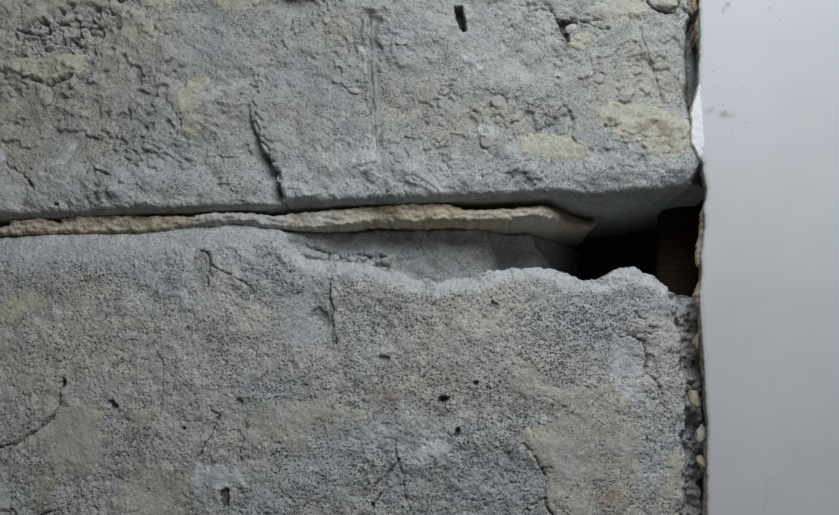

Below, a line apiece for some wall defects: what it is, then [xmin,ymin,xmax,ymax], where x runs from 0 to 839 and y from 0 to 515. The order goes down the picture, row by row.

spalling [288,229,579,283]
crack [0,381,65,453]